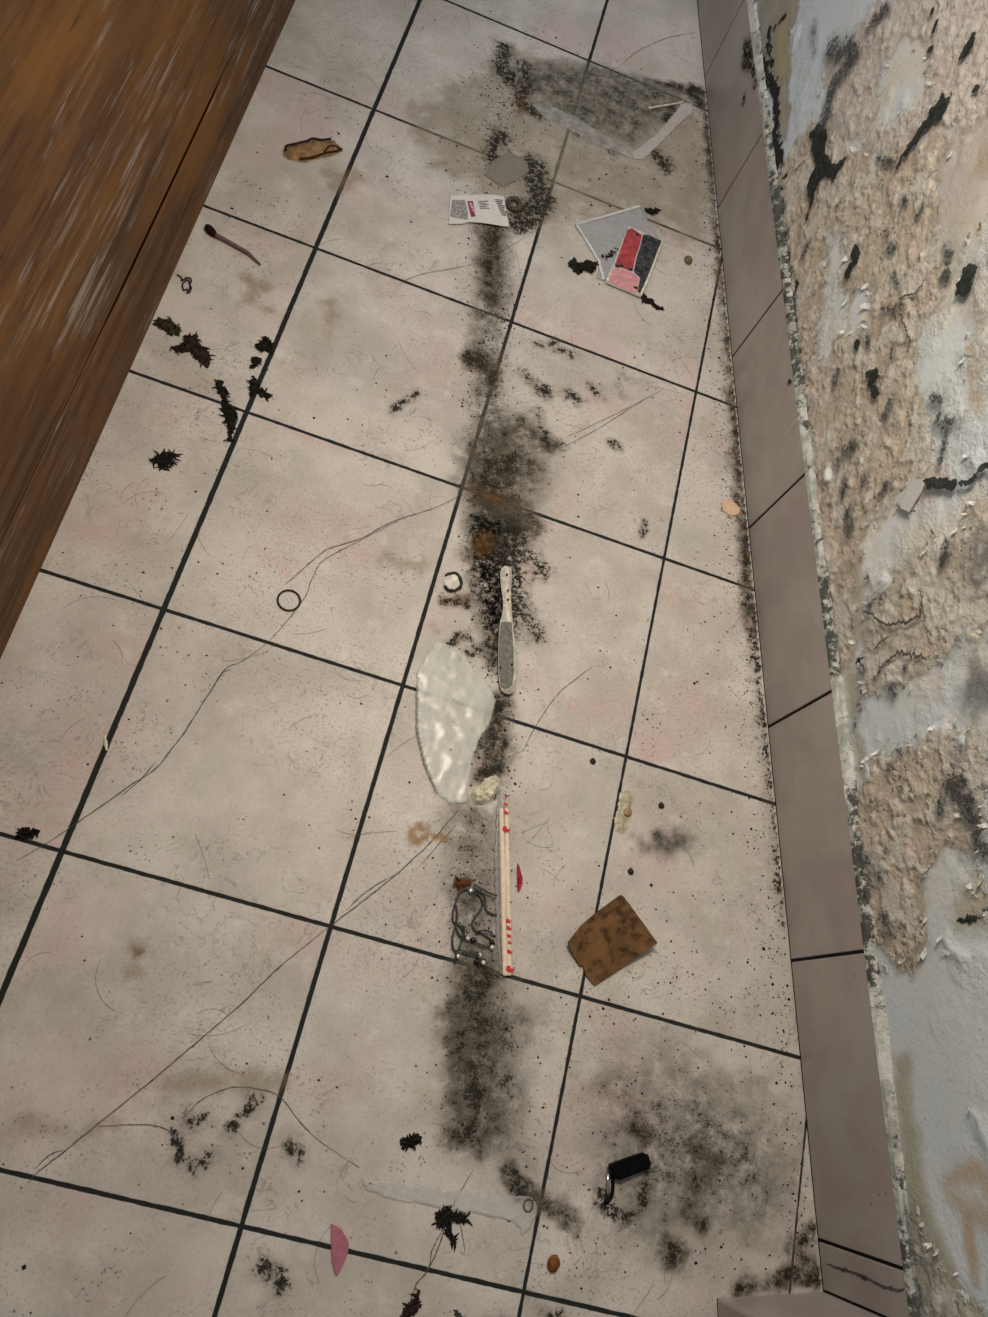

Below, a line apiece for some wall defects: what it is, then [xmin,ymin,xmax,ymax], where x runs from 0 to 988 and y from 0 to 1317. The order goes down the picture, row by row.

leakage [439,126,621,672]
leakage [491,41,785,926]
leakage [741,0,811,352]
leakage [805,1,892,221]
peeling [778,0,988,699]
leakage [876,92,951,170]
leakage [923,392,988,491]
leakage [939,241,977,297]
leakage [472,693,517,790]
peeling [857,711,988,974]
leakage [435,809,579,1239]
crack [826,1264,905,1292]